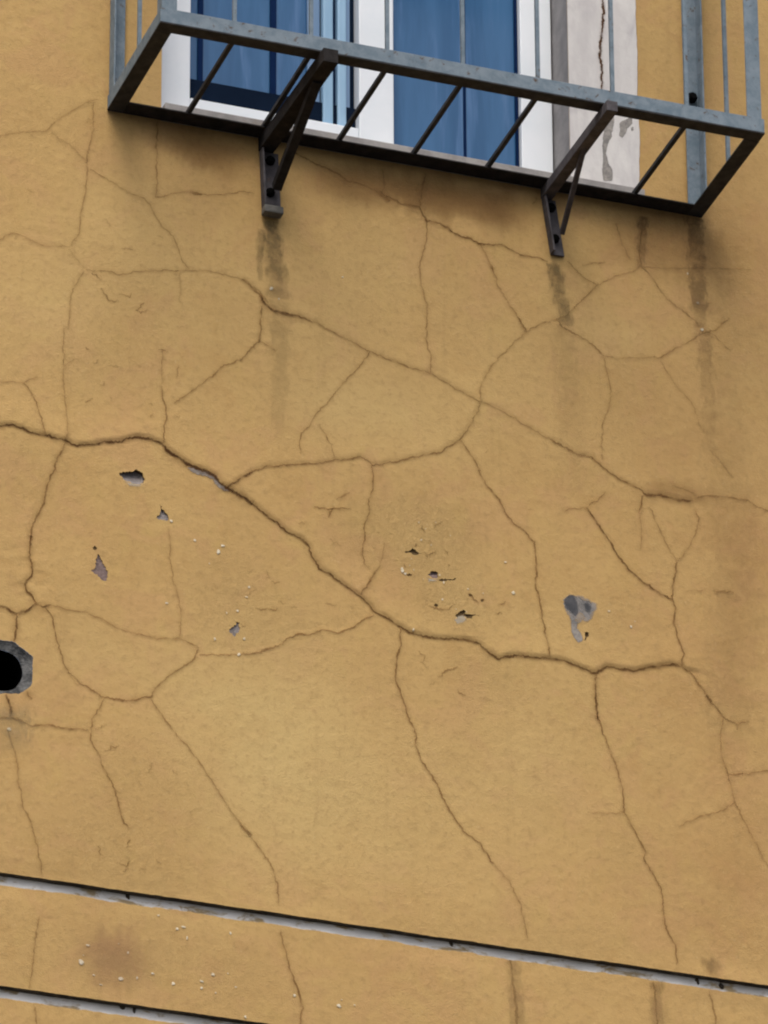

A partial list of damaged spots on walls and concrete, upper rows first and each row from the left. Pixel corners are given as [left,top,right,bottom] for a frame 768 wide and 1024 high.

crack [597,0,605,89]
peeling [602,117,634,181]
crack [314,163,544,260]
spalling [119,470,145,485]
spalling [91,546,108,581]
crack [0,290,728,961]
spalling [563,595,610,642]